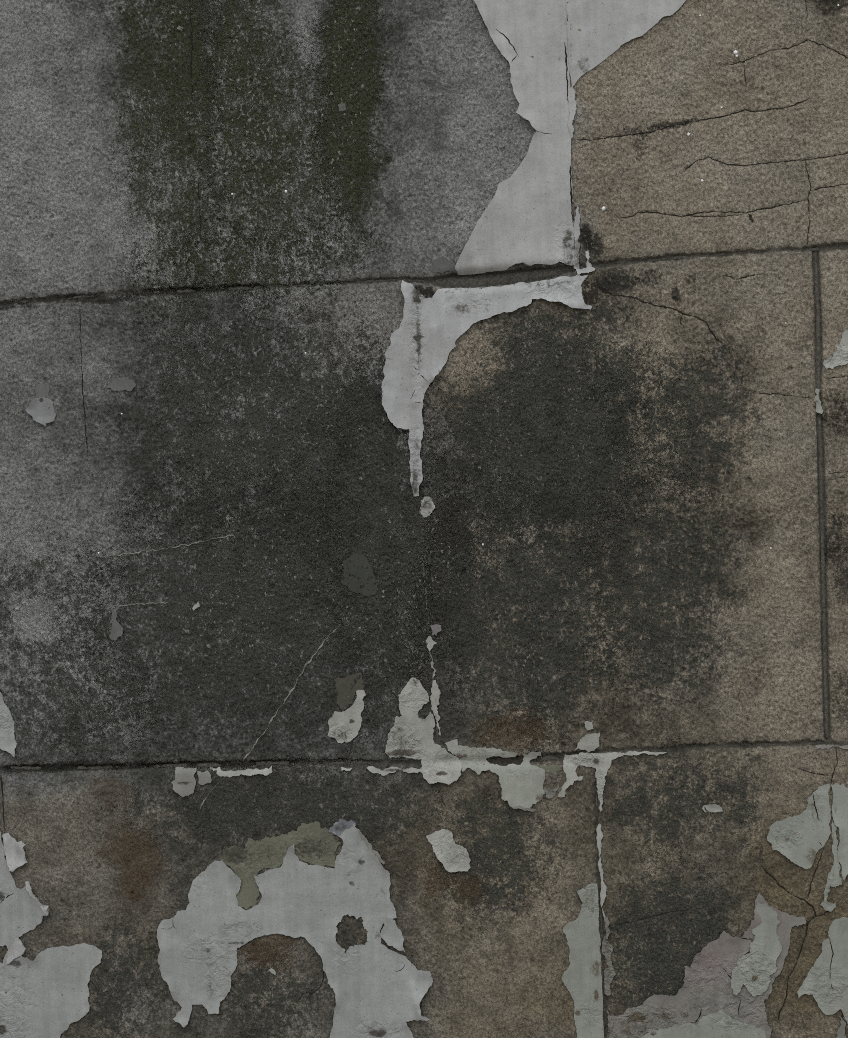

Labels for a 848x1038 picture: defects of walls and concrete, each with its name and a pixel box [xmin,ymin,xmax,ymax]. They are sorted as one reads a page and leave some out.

peeling [382,0,686,517]
crack [563,46,571,102]
crack [567,166,575,223]
crack [578,98,811,141]
crack [621,152,848,249]
damp [0,0,764,762]
peeling [367,624,667,812]
peeling [0,831,102,1038]
peeling [157,819,433,1038]
peeling [562,824,806,1038]
crack [762,750,847,1034]
peeling [767,783,848,1038]